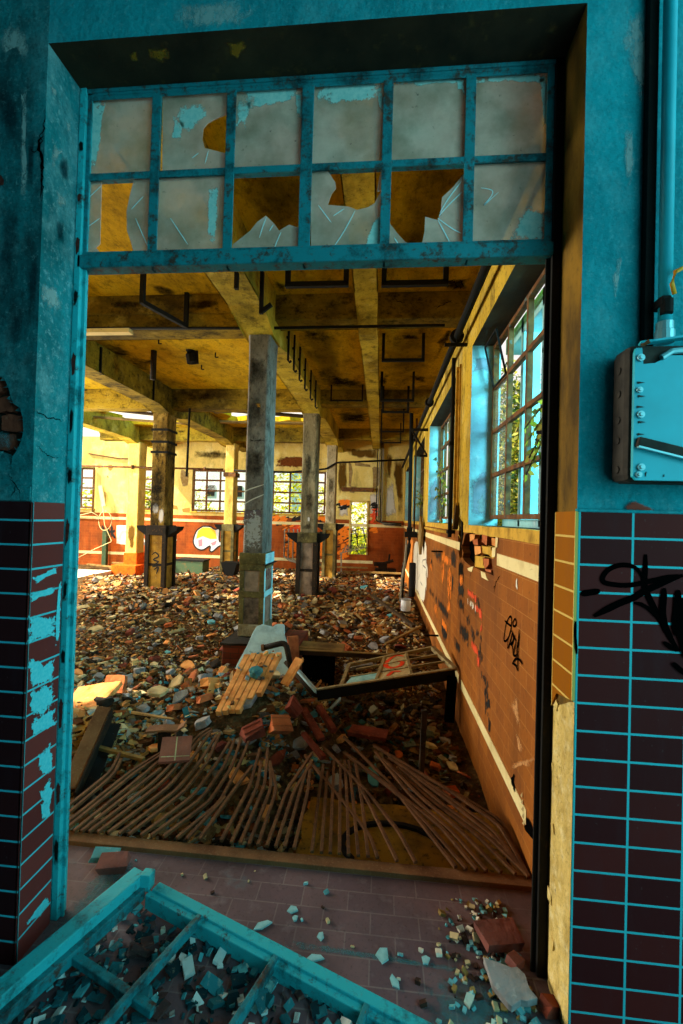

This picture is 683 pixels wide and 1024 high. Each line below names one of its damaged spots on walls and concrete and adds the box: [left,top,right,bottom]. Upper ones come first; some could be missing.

crack [30,110,46,198]
peeling [71,328,83,398]
flaking render [0,377,24,470]
spalling [467,534,499,581]
peeling [63,582,74,627]